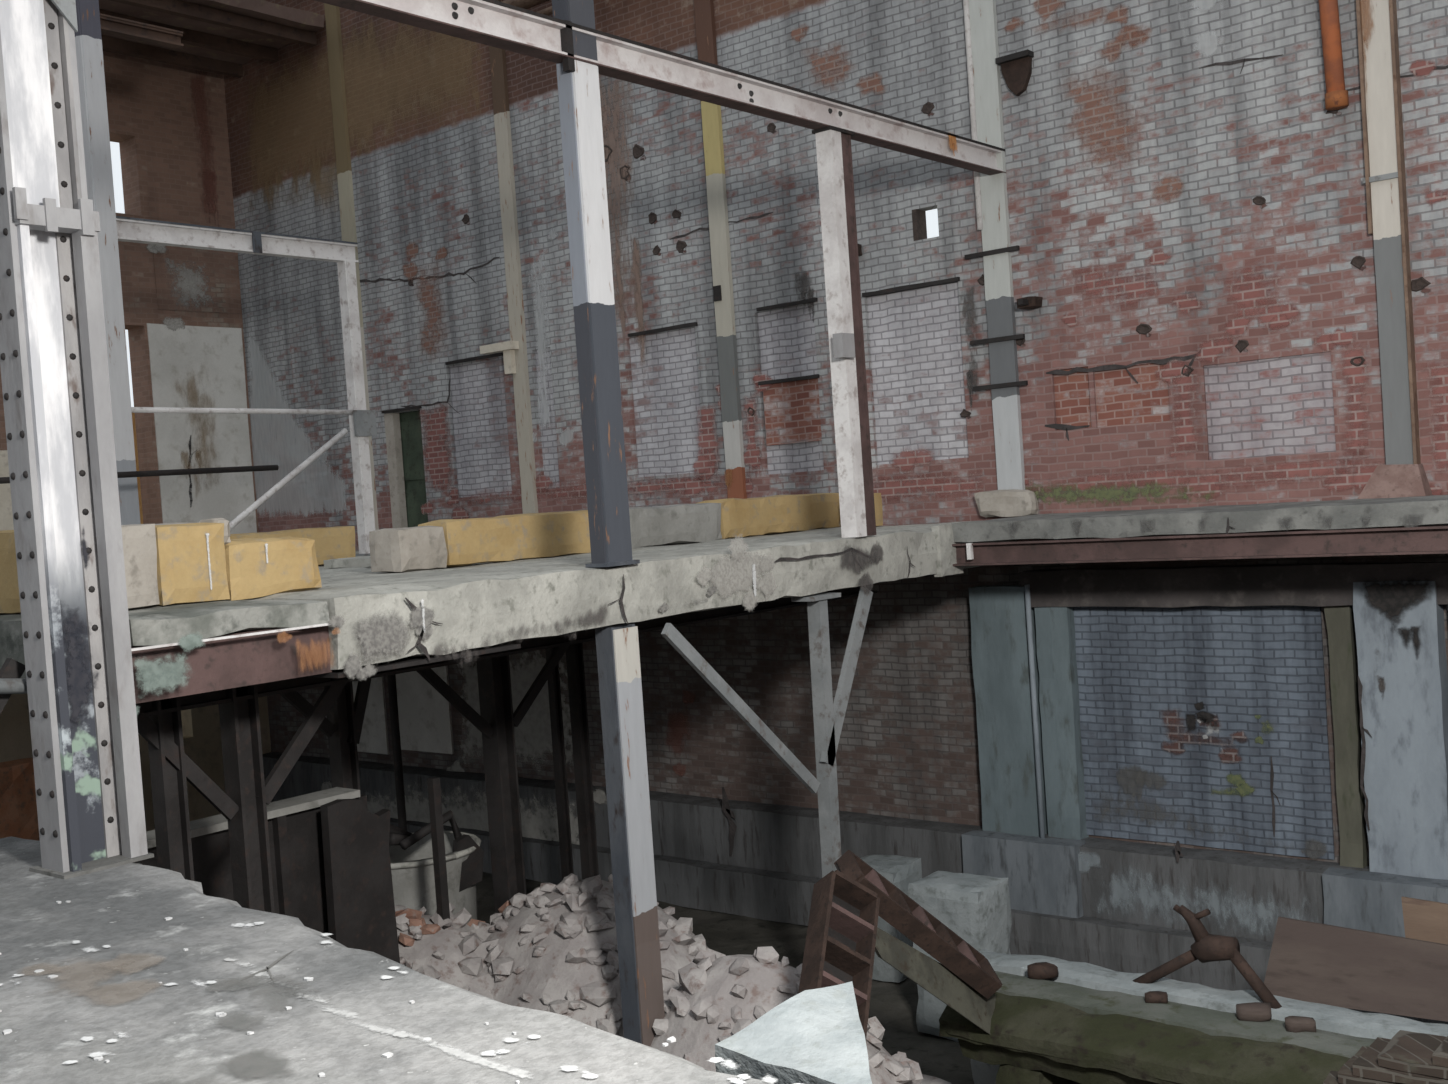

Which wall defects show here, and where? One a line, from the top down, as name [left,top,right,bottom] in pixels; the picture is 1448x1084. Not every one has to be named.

peeling [1034,0,1151,62]
crack [1400,65,1448,78]
spalling [921,102,935,116]
spalling [604,144,646,182]
spalling [648,209,682,224]
spalling [652,240,687,256]
crack [360,257,499,283]
spalling [1350,256,1366,271]
spalling [1411,277,1431,293]
peeling [627,384,721,496]
rust [278,628,340,670]
spalling [1162,702,1264,796]